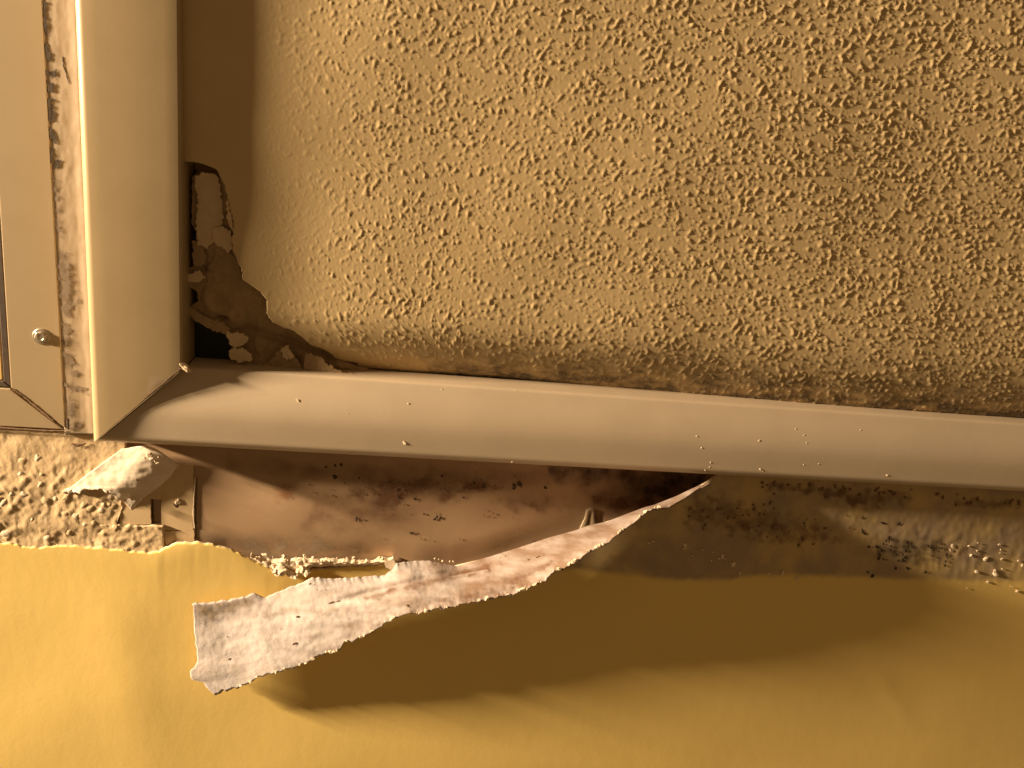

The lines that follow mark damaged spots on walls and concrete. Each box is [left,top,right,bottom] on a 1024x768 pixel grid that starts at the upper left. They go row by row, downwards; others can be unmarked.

spalling [188,162,370,374]
peeling [61,446,195,546]
damp [324,463,523,520]
damp [550,467,703,513]
damp [688,481,948,570]
peeling [190,482,710,695]